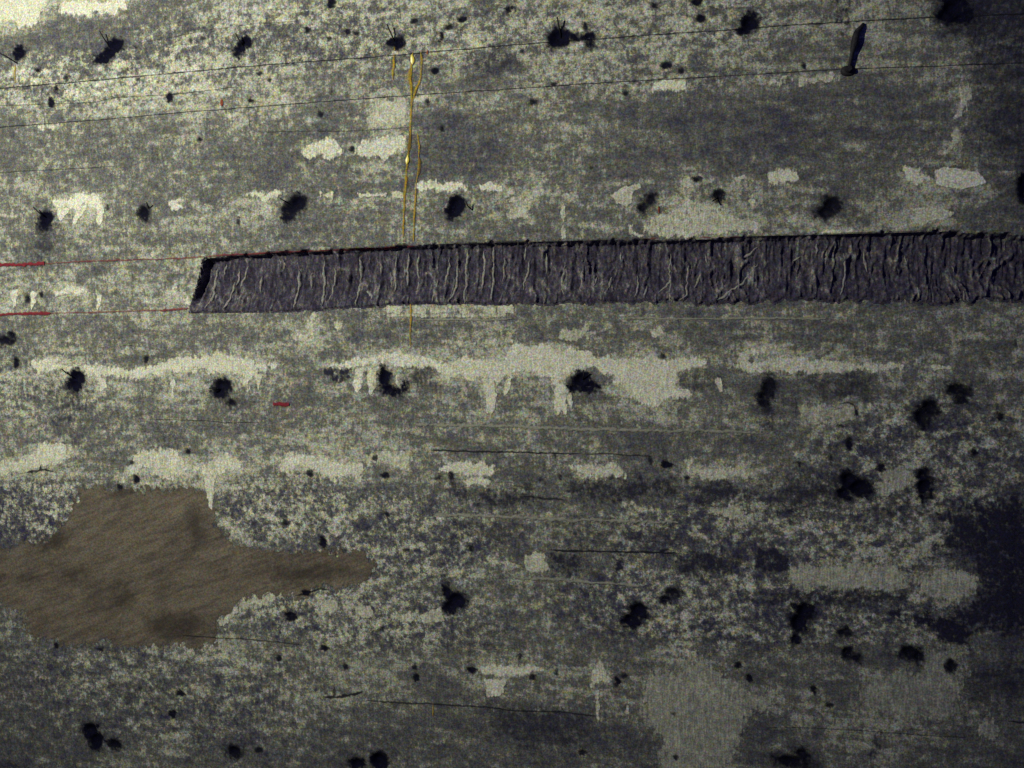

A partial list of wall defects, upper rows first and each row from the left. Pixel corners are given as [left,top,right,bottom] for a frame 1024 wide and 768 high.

corrosion [402,49,428,240]
peeling [386,304,514,318]
water stain [323,367,351,383]
crack [433,449,649,458]
crack [549,547,676,555]